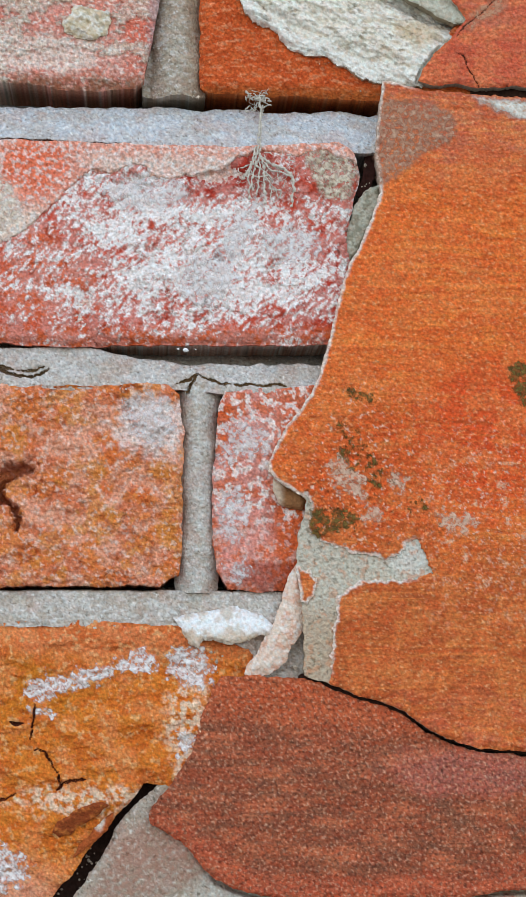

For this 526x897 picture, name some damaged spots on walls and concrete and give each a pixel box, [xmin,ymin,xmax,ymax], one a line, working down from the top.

spalling [240,0,465,89]
crack [456,1,526,98]
spalling [0,151,360,348]
spalling [0,457,39,532]
peeling [328,452,387,525]
peeling [387,472,410,495]
peeling [437,512,478,533]
flaking render [244,479,433,684]
crack [9,704,86,791]
crack [298,673,526,754]
peeling [52,802,114,858]